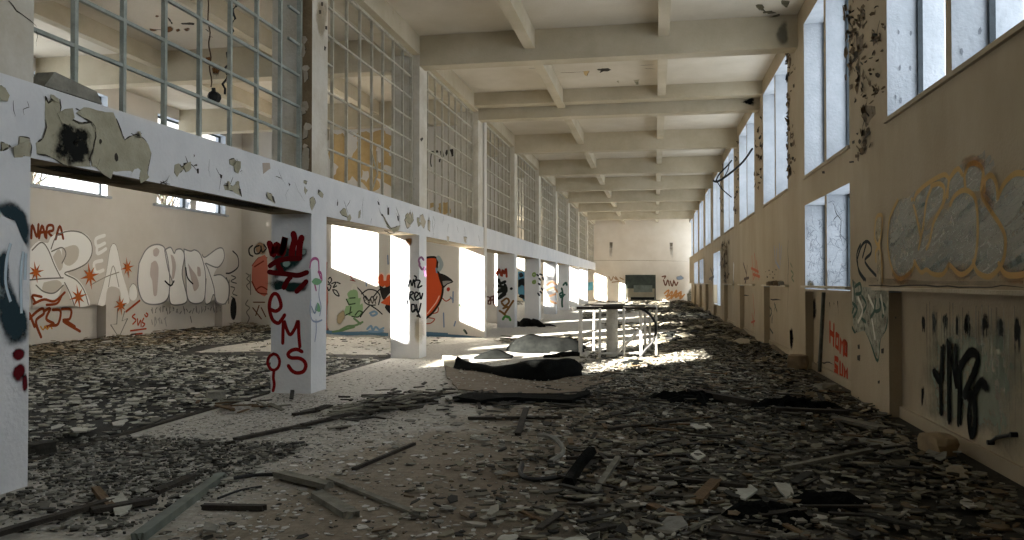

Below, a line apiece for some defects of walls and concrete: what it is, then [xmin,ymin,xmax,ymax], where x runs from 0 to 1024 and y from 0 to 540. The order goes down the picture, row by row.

peeling [0,85,10,102]
peeling [0,94,151,183]
peeling [174,155,199,176]
peeling [220,158,242,197]
peeling [328,130,451,233]
peeling [784,53,796,179]
peeling [842,0,912,163]